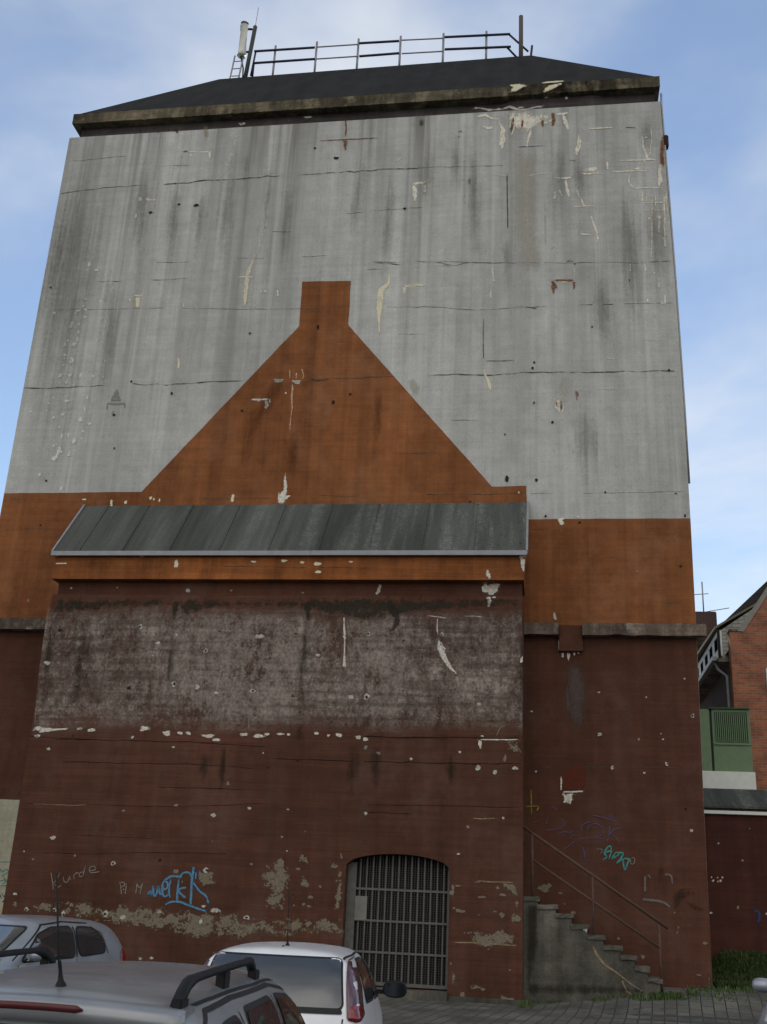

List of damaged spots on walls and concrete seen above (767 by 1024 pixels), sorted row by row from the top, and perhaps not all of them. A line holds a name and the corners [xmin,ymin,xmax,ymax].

water stain [477,112,614,155]
crack [165,165,277,185]
crack [304,165,508,227]
water stain [529,128,672,304]
crack [406,306,674,376]
crack [134,379,232,387]
spalling [482,570,500,607]
water stain [35,598,523,728]
spalling [560,777,583,804]
peeling [13,850,344,939]
peeling [464,883,521,950]